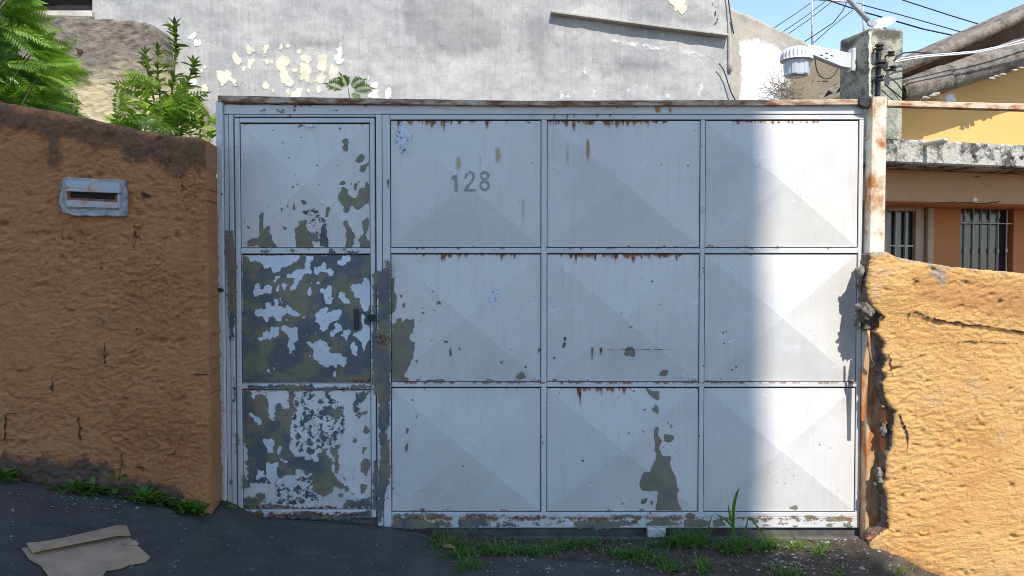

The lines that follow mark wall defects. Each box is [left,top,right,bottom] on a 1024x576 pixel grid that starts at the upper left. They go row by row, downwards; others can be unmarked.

peeling [189,43,353,97]
peeling [368,75,392,99]
leakage [0,104,206,177]
peeling [224,138,519,530]
crack [880,311,1024,344]
corrosion [473,379,857,401]
flaking render [878,407,892,450]
leakage [0,454,184,504]
peeling [532,389,726,531]
corrosion [393,508,698,522]